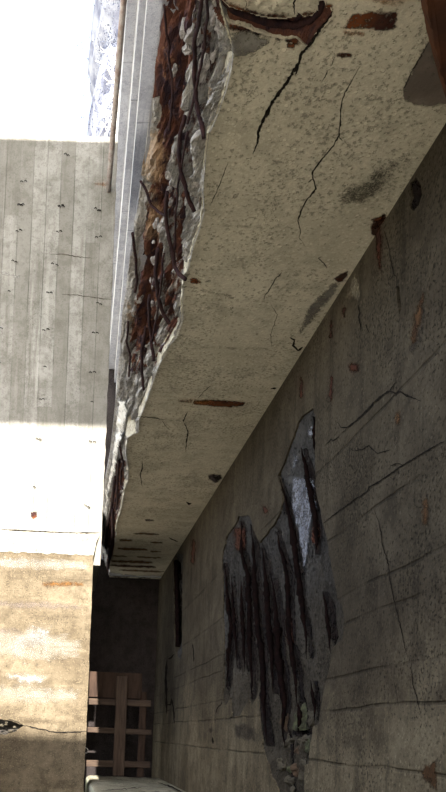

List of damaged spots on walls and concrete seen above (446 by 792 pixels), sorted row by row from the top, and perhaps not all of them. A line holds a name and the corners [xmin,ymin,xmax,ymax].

crack [253,11,333,153]
corrosion [345,0,402,36]
crack [298,67,360,268]
spalling [101,0,337,576]
crack [324,382,446,523]
spalling [222,410,344,792]
crack [375,513,420,710]
spalling [0,719,23,735]
crack [9,719,85,733]
crack [164,654,175,723]